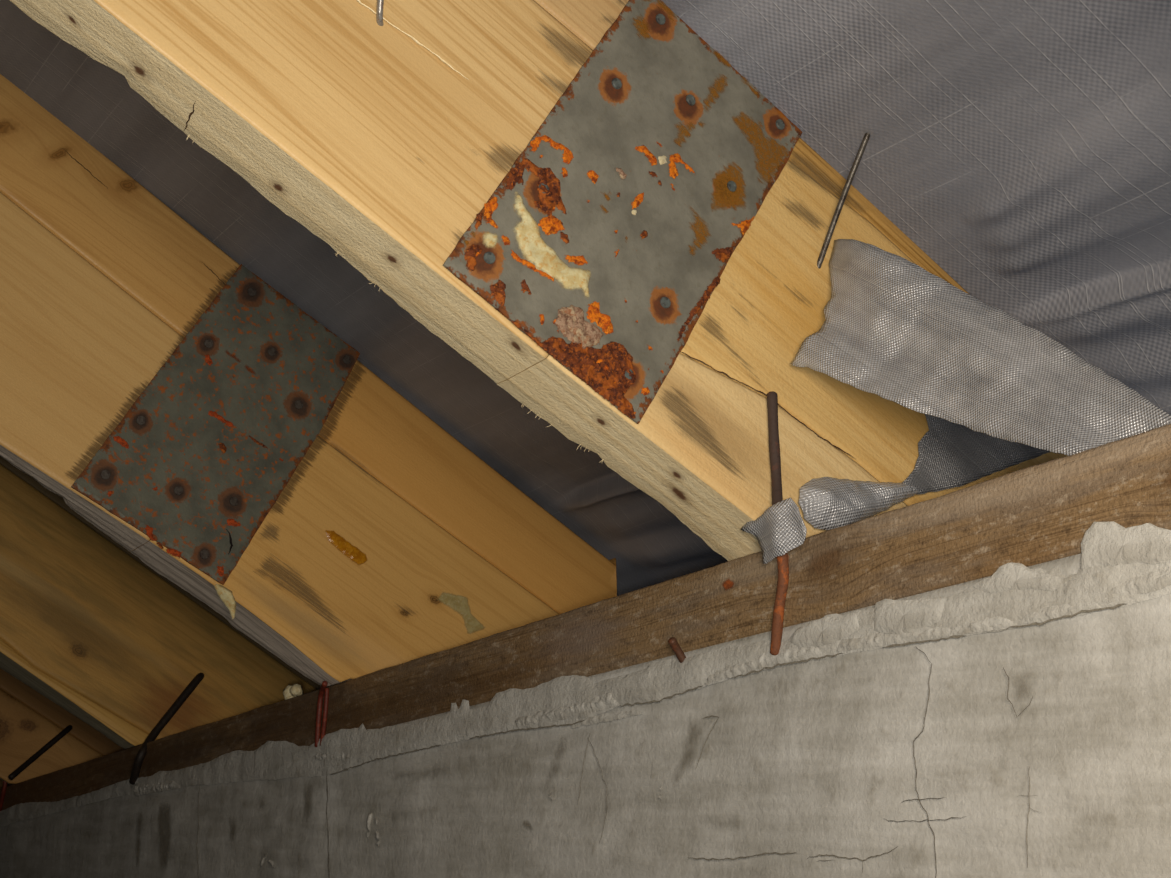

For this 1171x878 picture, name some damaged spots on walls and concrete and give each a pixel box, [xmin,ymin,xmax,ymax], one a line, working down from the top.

corrosion [635,123,703,191]
corrosion [464,135,587,295]
corrosion [587,192,644,215]
corrosion [689,212,734,263]
corrosion [711,163,754,235]
corrosion [677,276,721,342]
corrosion [486,280,664,419]
crack [1008,603,1125,628]
crack [621,686,702,707]
crack [326,745,440,878]
crack [470,720,607,840]
crack [693,635,966,878]